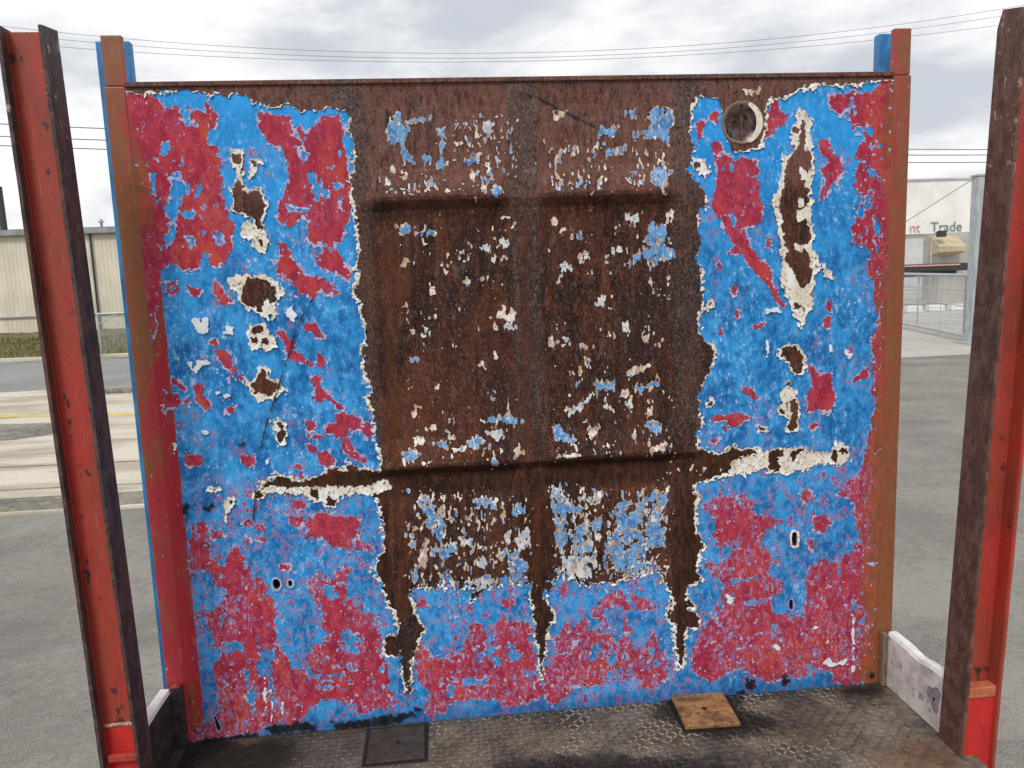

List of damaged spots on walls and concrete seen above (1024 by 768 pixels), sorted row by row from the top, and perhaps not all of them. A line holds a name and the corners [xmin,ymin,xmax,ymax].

peeling [255,109,353,300]
peeling [394,222,437,268]
peeling [379,110,520,212]
peeling [440,215,517,331]
peeling [551,217,593,284]
peeling [543,105,676,197]
peeling [605,209,676,300]
peeling [275,318,374,471]
corrosion [125,76,894,694]
peeling [600,316,664,348]
peeling [688,83,893,686]
peeling [401,323,707,721]